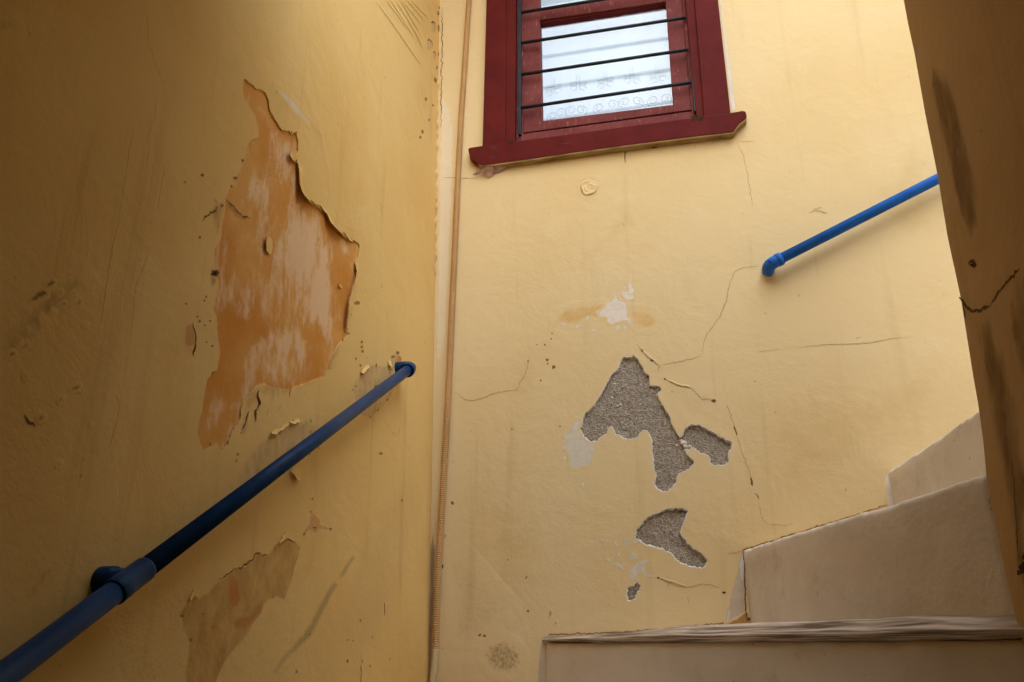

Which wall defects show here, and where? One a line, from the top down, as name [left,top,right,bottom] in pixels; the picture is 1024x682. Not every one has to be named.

peeling [197,78,403,491]
crack [451,354,530,401]
peeling [561,279,637,331]
flaking render [561,355,733,493]
crack [637,266,788,526]
crack [806,336,912,347]
crack [959,269,1020,316]
peeling [175,498,332,682]
flaking render [591,507,708,602]